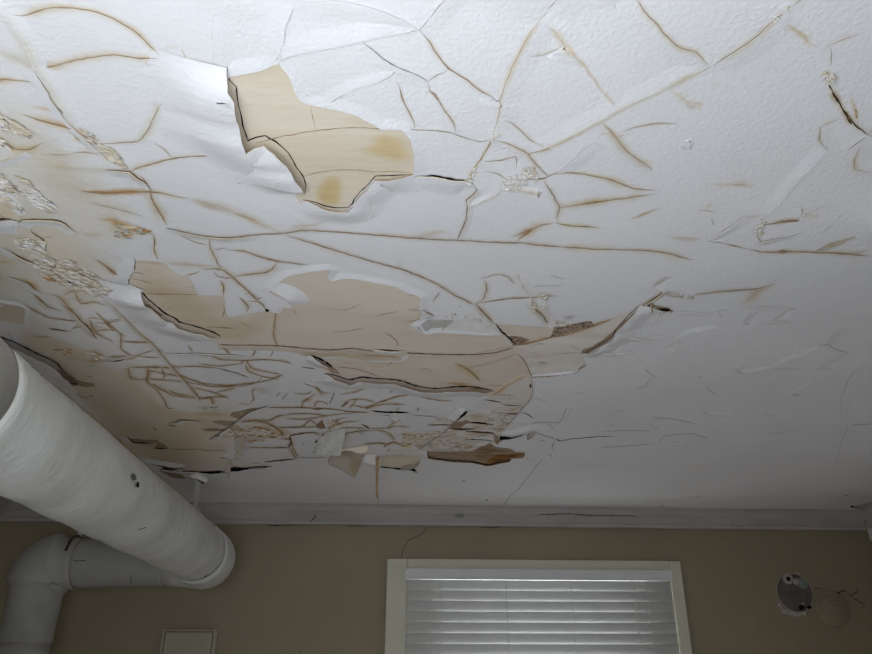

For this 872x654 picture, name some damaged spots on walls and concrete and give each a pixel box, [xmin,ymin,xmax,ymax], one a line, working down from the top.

crack [0,276,446,462]
peeling [133,45,488,225]
peeling [0,113,774,484]
crack [0,0,801,344]
crack [749,233,872,260]
crack [481,408,615,528]
crack [540,511,634,519]